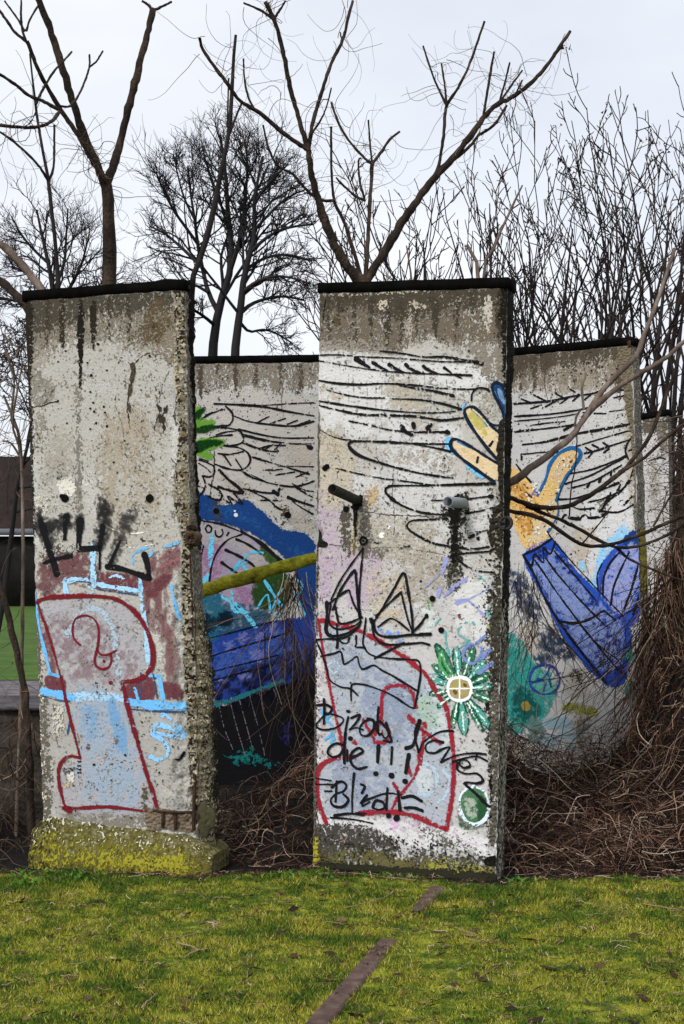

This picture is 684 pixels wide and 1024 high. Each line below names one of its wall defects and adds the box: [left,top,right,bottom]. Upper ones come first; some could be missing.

damp [25,260,633,880]
peeling [28,289,668,876]